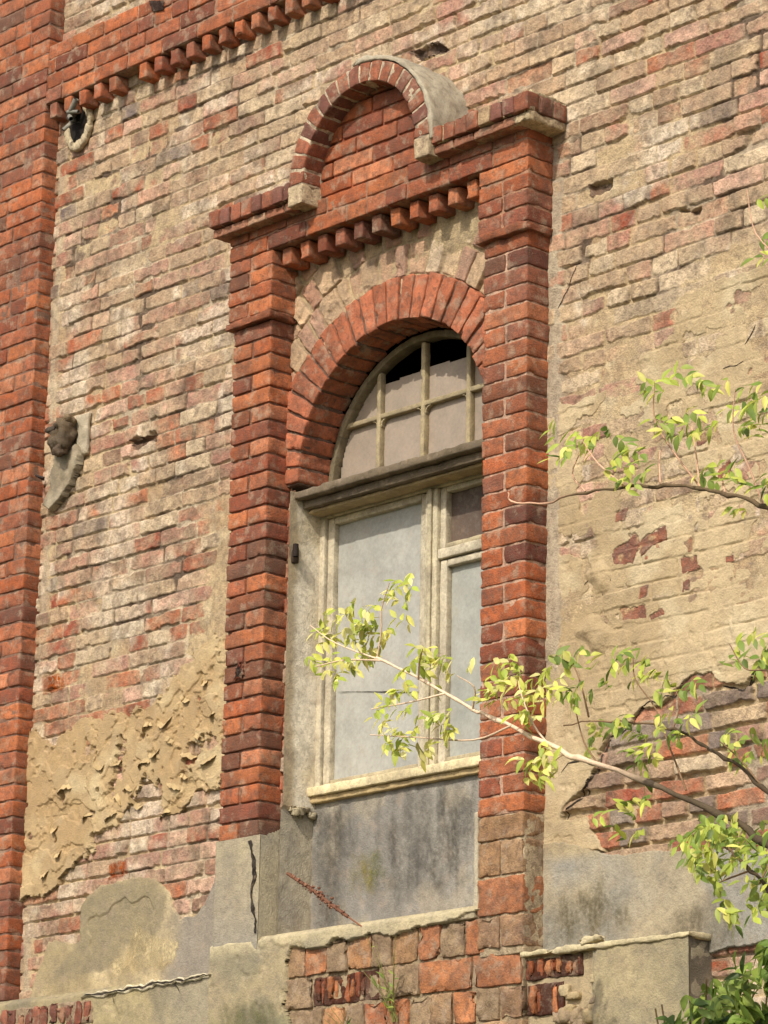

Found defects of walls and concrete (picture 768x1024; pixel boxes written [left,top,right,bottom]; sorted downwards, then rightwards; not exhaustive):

spalling [409,41,450,61]
peeling [544,266,768,853]
peeling [19,632,244,902]
crack [248,840,256,933]
crack [81,973,211,1002]